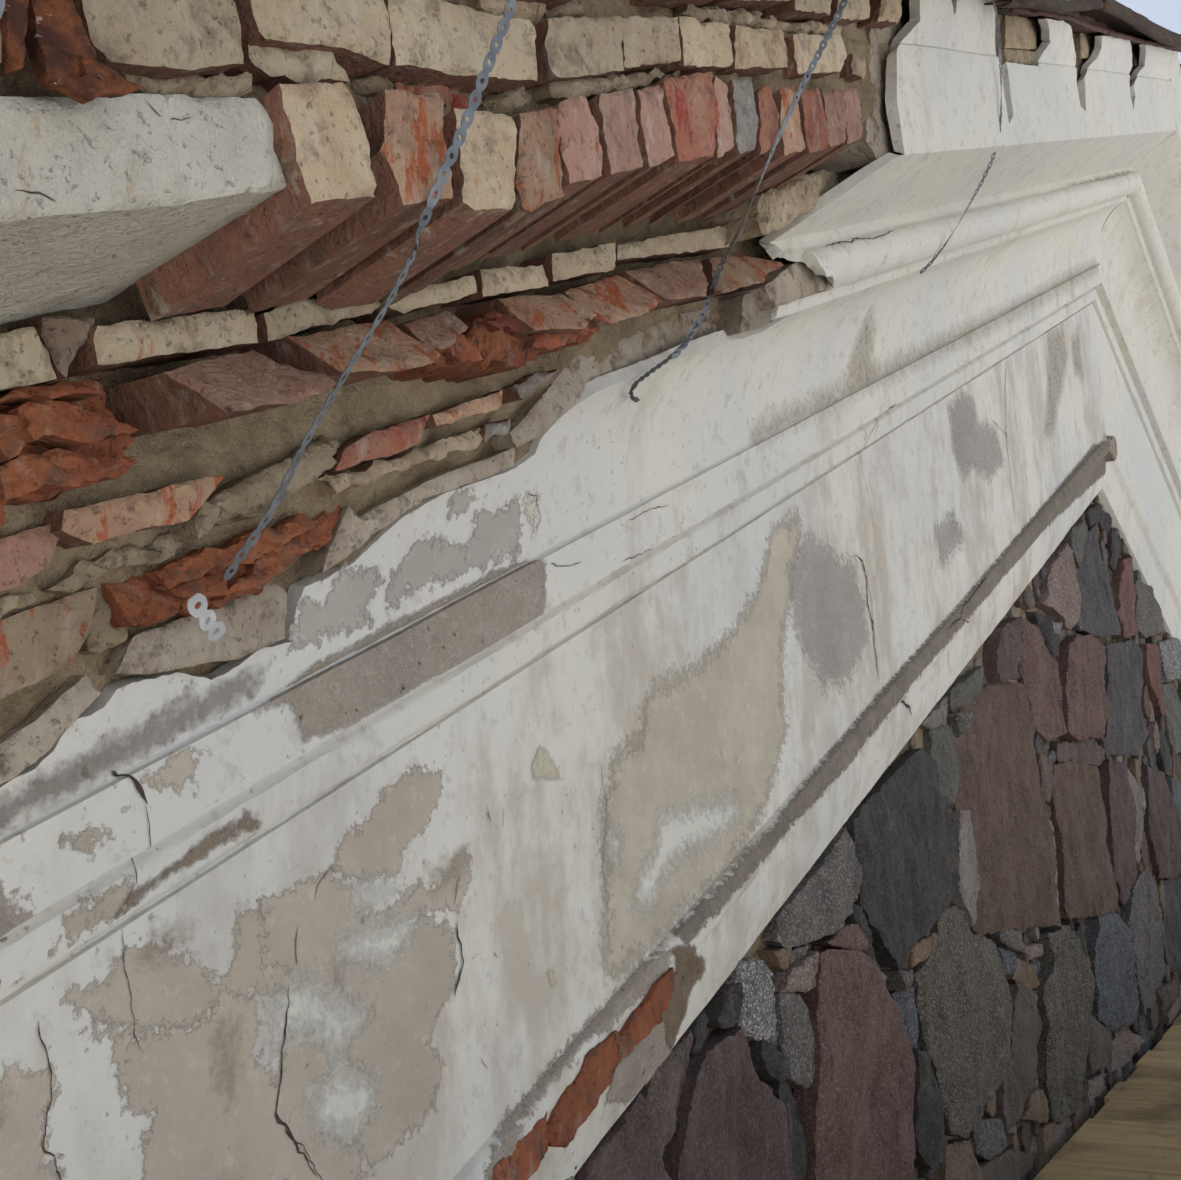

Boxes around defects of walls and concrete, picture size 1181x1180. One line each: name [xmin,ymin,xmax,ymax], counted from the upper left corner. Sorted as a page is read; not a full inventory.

crack [826,231,891,247]
flaking render [0,0,910,785]
spalling [0,882,33,942]
peeling [0,1063,66,1180]
crack [38,1020,62,1180]
crack [112,770,151,1055]
peeling [141,747,203,793]
peeling [49,765,472,1180]
crack [275,928,322,1179]
peeling [485,514,802,1180]